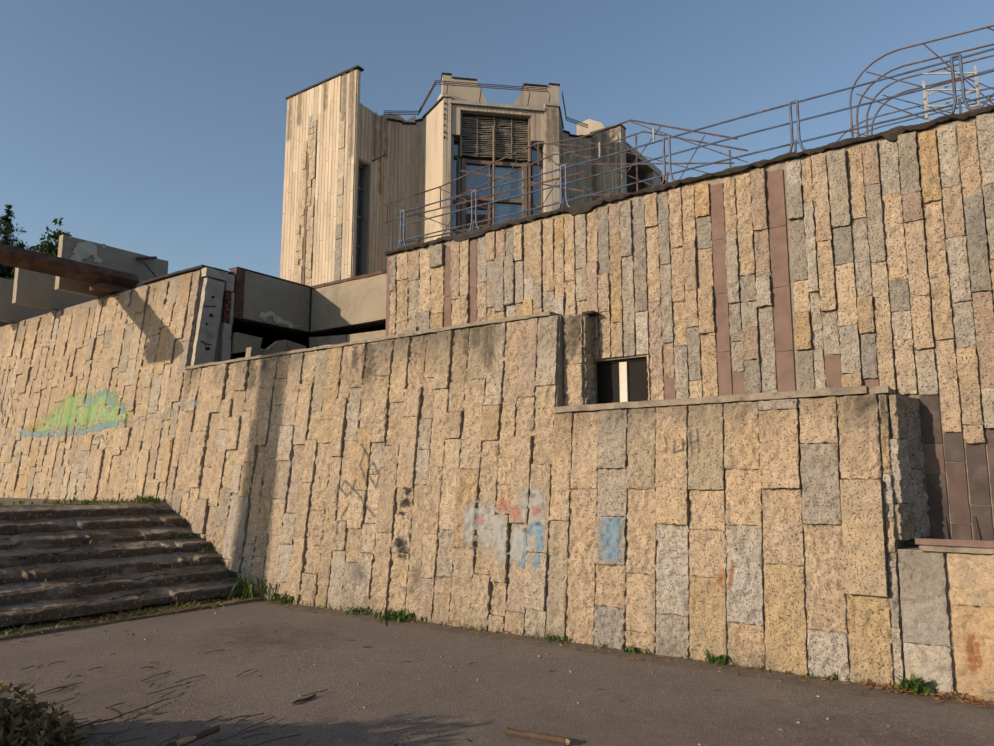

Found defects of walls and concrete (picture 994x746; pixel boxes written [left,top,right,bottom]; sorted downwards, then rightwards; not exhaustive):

peeling [69,236,106,263]
peeling [259,311,300,329]